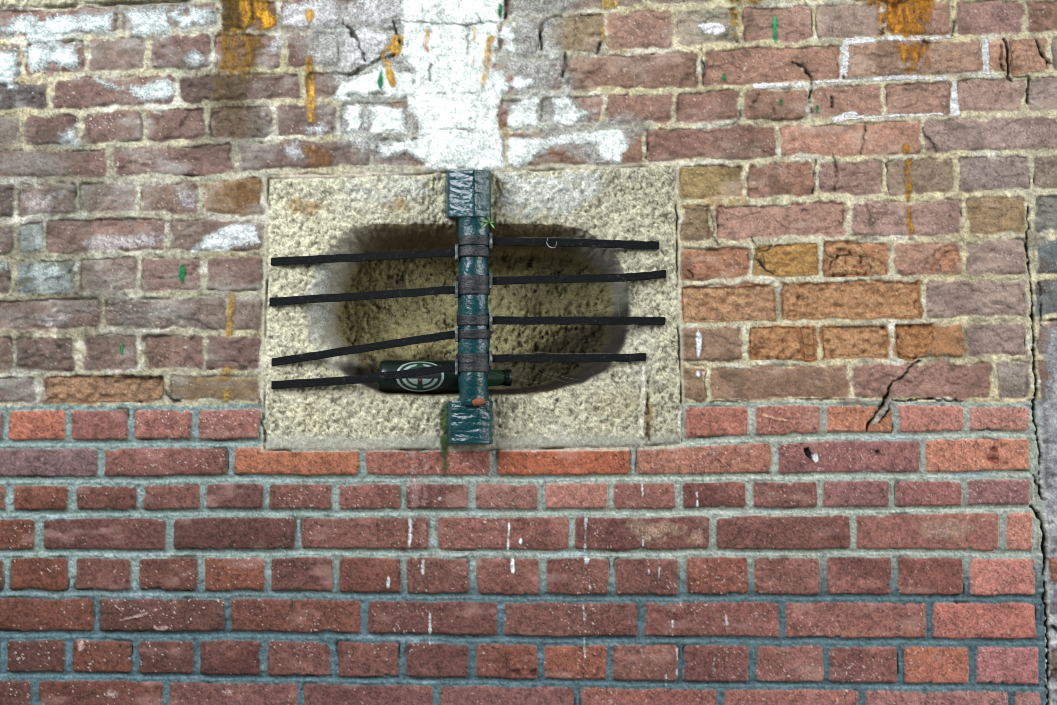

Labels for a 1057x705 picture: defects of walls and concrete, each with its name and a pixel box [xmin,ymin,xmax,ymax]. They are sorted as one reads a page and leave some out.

leakage [214,0,414,168]
crack [343,0,507,76]
crack [539,23,567,76]
leakage [482,0,642,219]
rust [856,0,934,73]
rust [903,144,914,237]
efflorescence [308,263,334,337]
crack [866,360,958,431]